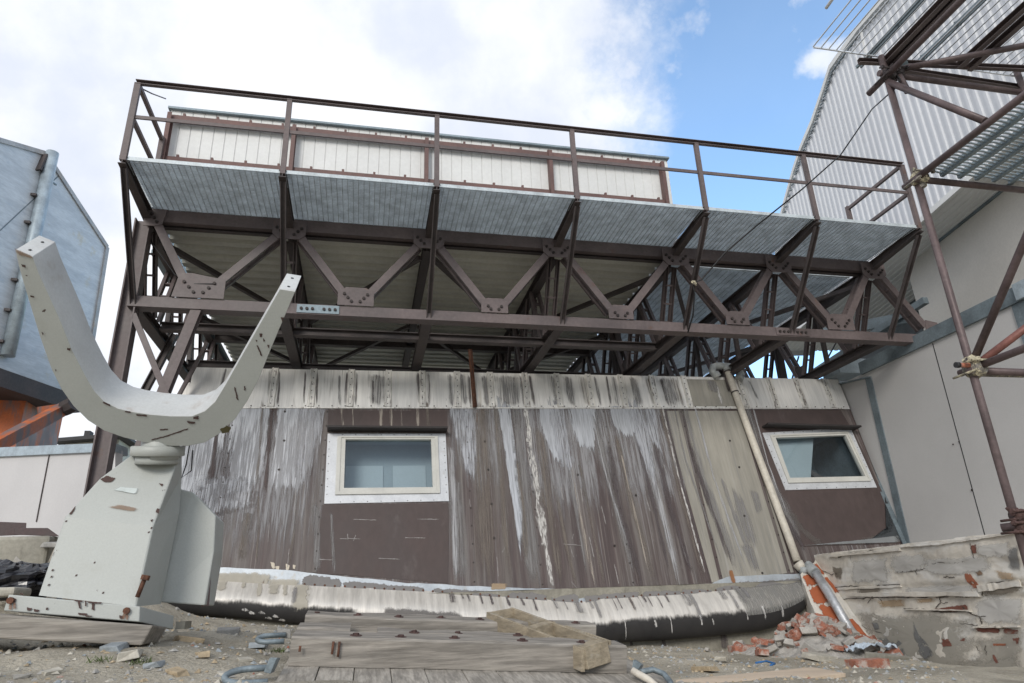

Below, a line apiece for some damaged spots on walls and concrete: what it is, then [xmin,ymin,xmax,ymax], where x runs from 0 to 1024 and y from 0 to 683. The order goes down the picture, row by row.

water stain [338,373,357,425]
water stain [372,375,392,426]
water stain [416,373,430,426]
water stain [208,433,228,490]
water stain [239,371,280,559]
water stain [448,374,653,582]
water stain [630,378,753,572]
water stain [217,572,308,610]
water stain [681,594,714,625]
water stain [719,582,806,619]
crack [822,544,1005,654]
flaking render [906,570,1021,663]